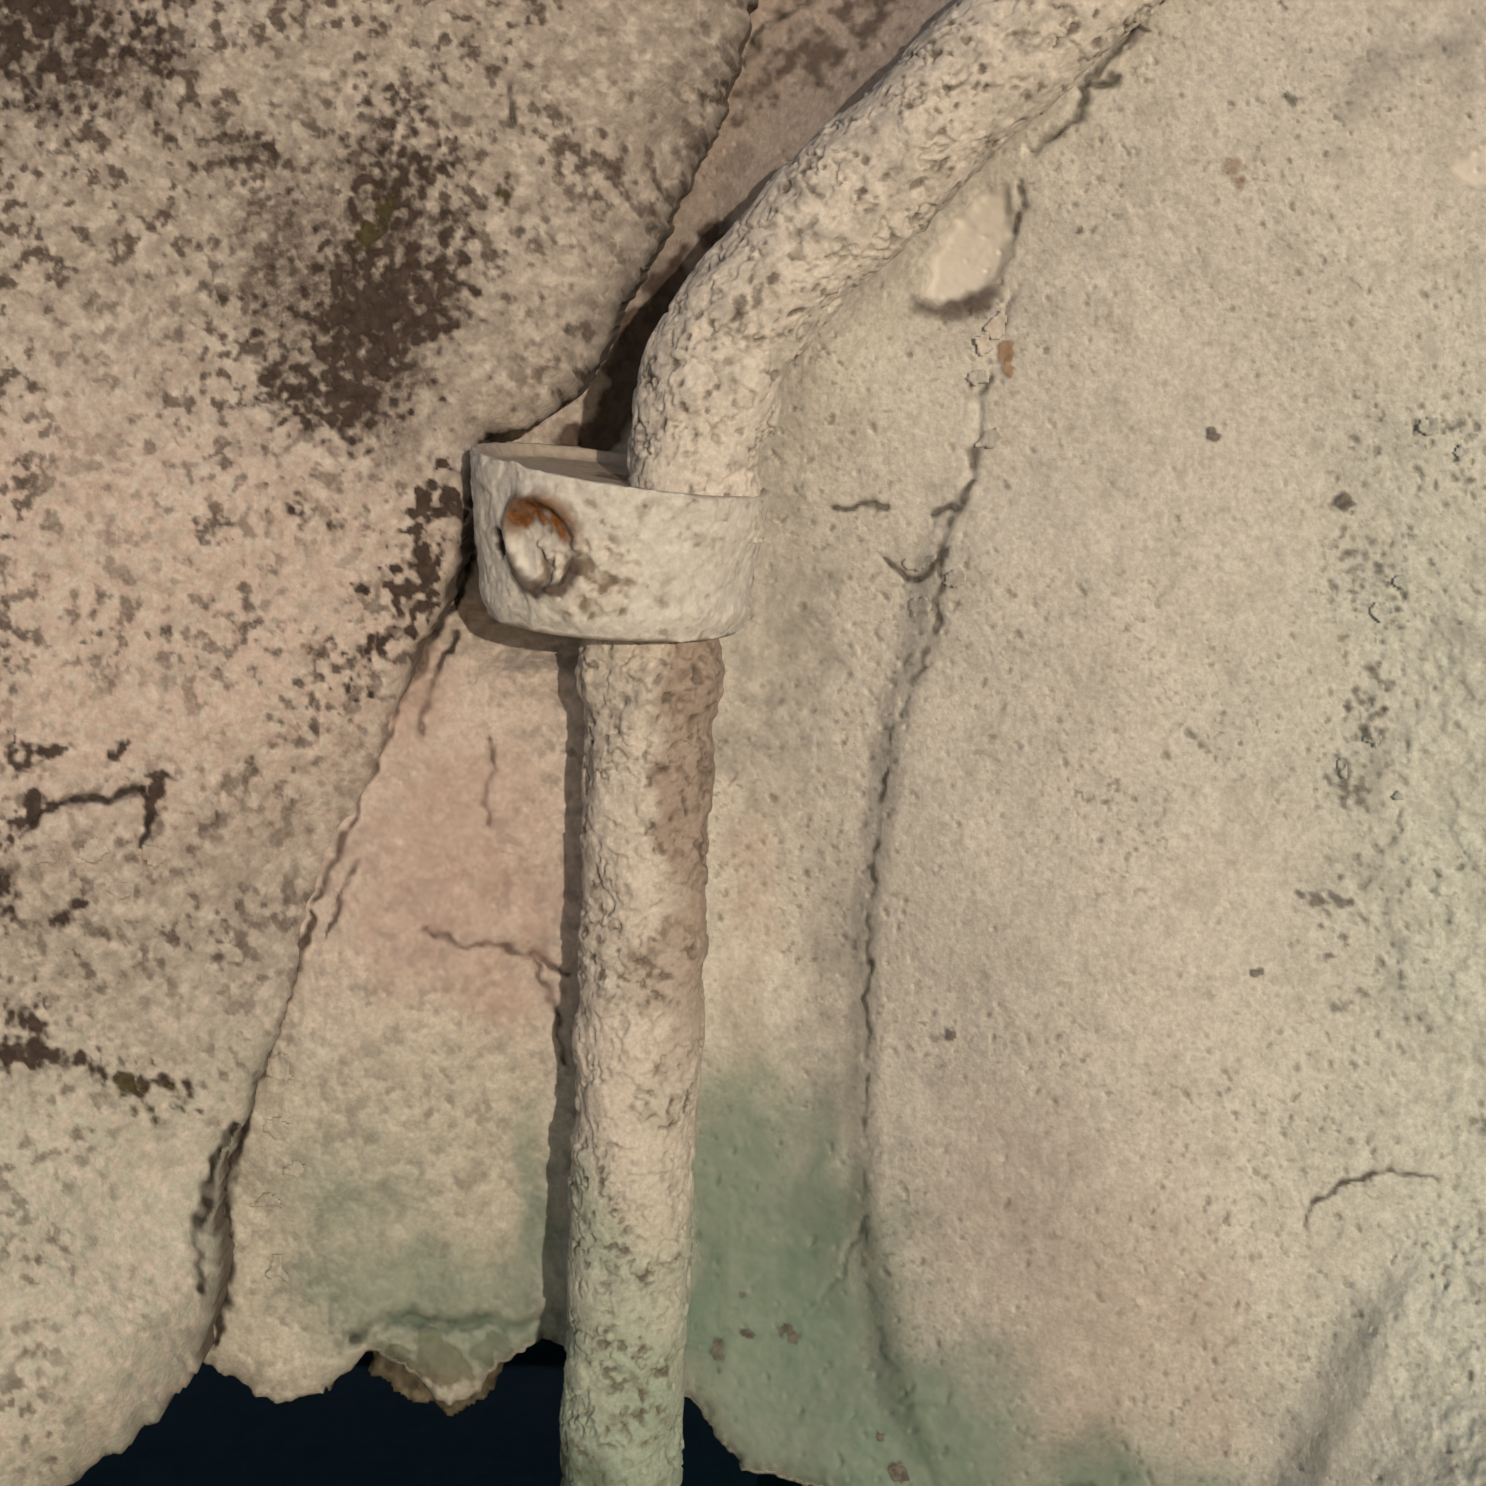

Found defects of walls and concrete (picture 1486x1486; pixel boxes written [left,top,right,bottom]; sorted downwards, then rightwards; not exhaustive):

mould [0,0,195,127]
spalling [1449,140,1486,188]
mould [216,83,482,471]
mould [350,458,469,662]
rust [505,495,574,541]
rust [507,556,578,598]
crack [883,447,979,674]
leakage [0,735,68,852]
crack [28,785,155,848]
leakage [0,978,201,1124]
crack [423,926,570,1065]
crack [1306,1169,1421,1222]